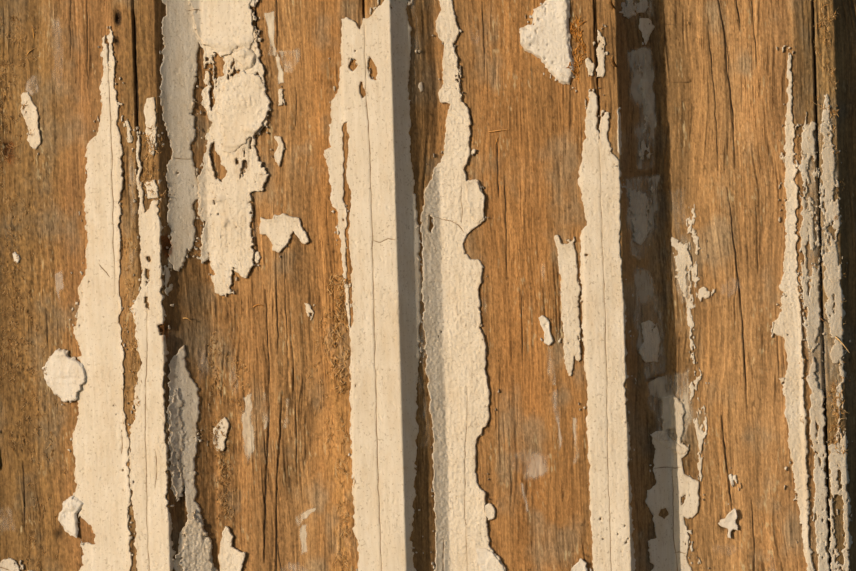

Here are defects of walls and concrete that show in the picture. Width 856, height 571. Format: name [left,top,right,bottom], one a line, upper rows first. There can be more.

peeling [519,0,577,92]
peeling [585,23,608,78]
peeling [611,0,655,49]
crack [707,0,757,162]
peeling [42,0,309,571]
crack [264,263,298,571]
peeling [323,0,506,571]
peeling [539,89,660,571]
peeling [645,204,715,571]
crack [722,421,755,570]
peeling [771,45,853,571]